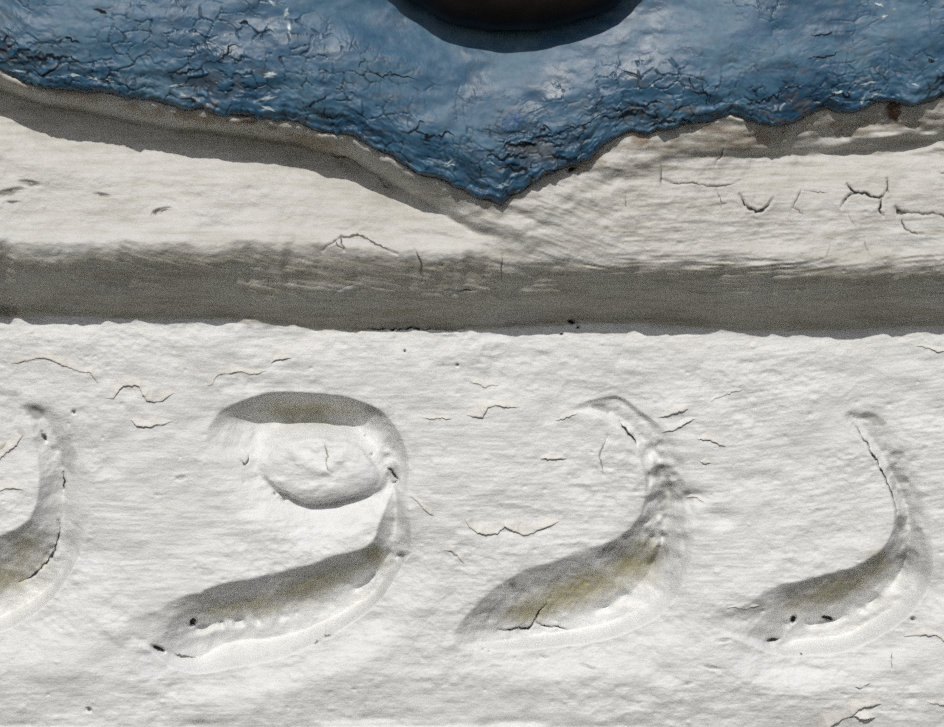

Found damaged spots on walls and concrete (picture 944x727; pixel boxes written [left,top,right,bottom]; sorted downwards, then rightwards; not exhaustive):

crack [3,35,80,61]
crack [167,20,248,75]
crack [809,32,840,59]
crack [359,60,417,80]
crack [689,77,711,104]
crack [747,86,802,105]
crack [634,100,691,126]
crack [406,120,453,141]
crack [487,114,601,173]
crack [660,168,769,213]
crack [794,180,944,253]
crack [330,234,392,252]